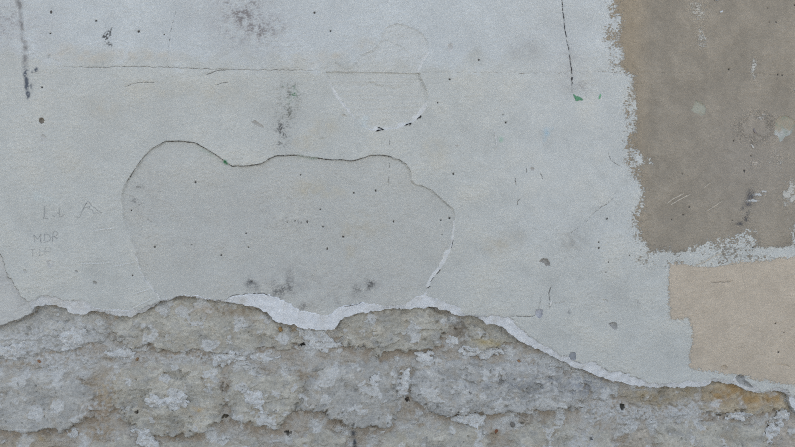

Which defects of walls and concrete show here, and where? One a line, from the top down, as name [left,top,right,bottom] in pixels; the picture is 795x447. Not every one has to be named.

flaking render [0,140,795,414]